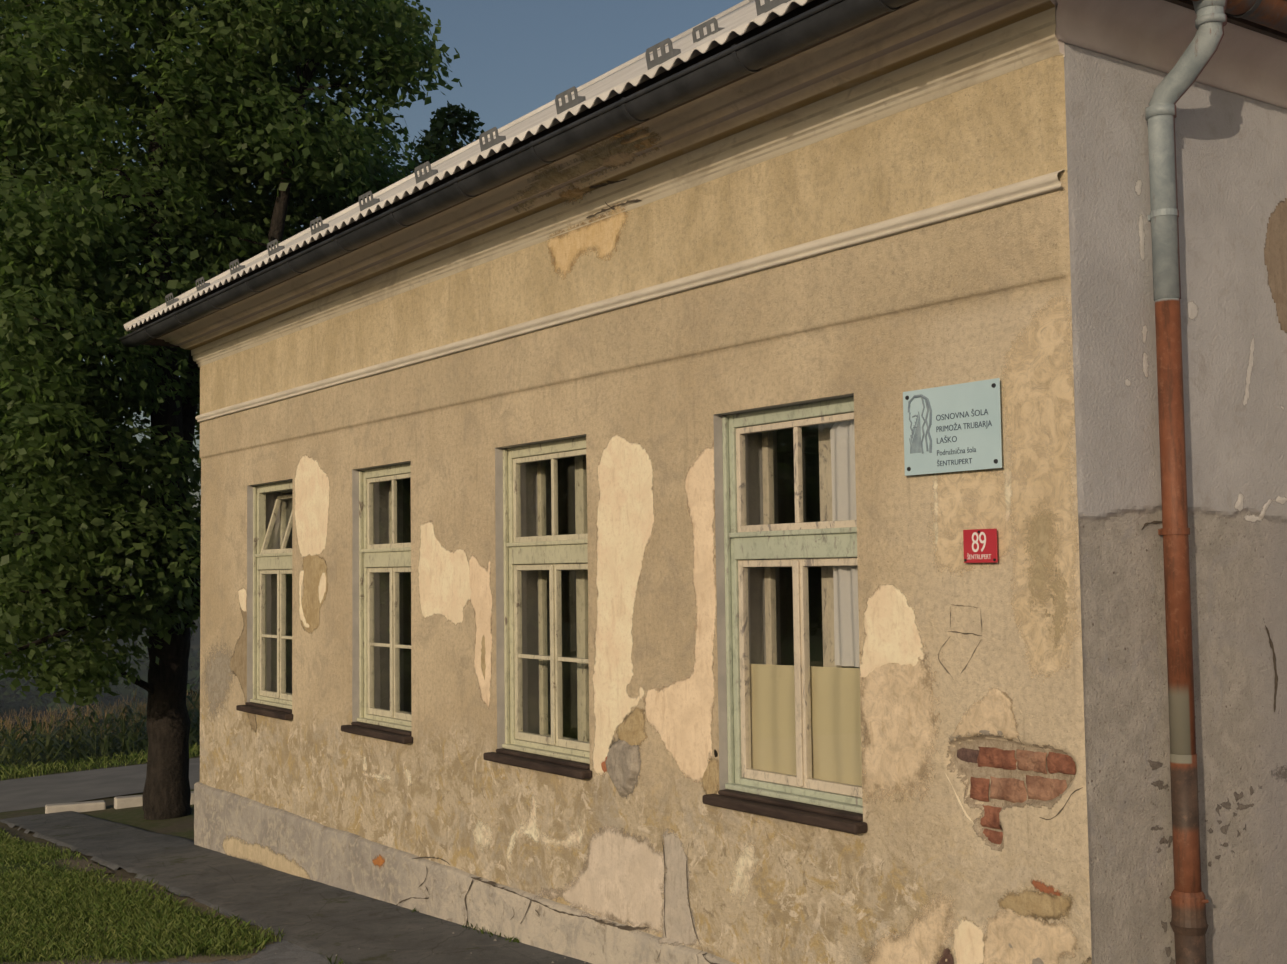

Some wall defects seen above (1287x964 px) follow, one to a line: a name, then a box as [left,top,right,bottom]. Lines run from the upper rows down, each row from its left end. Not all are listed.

peeling [547,206,628,280]
peeling [1264,198,1287,333]
peeling [294,455,330,634]
peeling [418,520,493,708]
peeling [592,434,719,794]
peeling [860,584,1083,852]
spalling [1148,760,1168,804]
crack [396,842,717,964]
peeling [534,825,666,938]
peeling [865,880,1091,964]